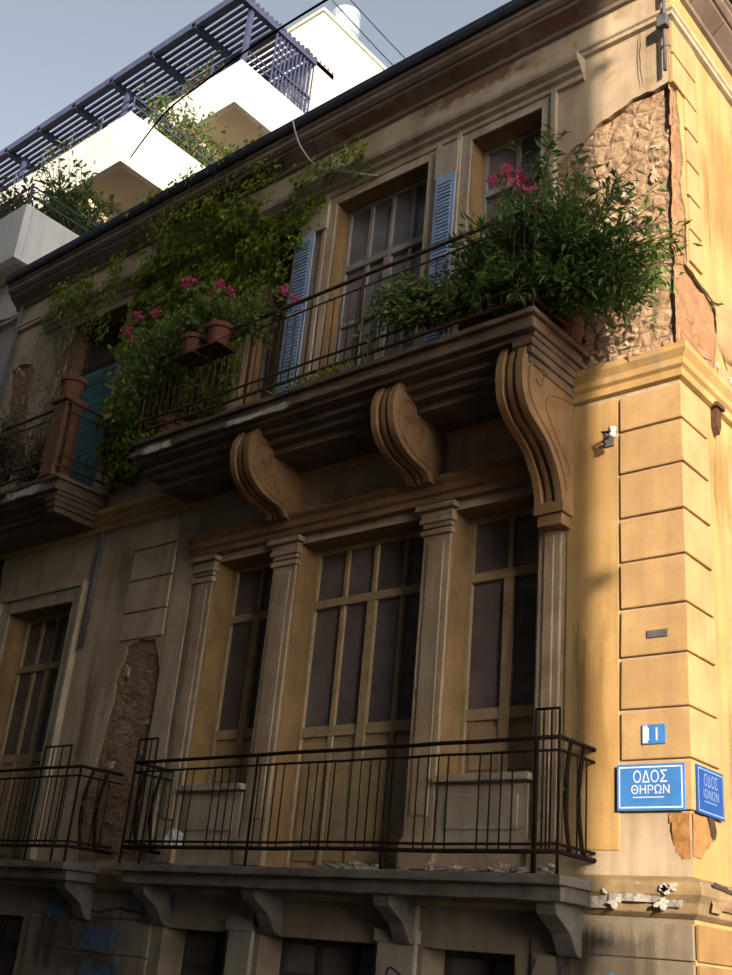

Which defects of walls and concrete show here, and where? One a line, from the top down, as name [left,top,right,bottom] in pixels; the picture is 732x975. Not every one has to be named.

peeling [558,82,732,387]
peeling [78,639,160,862]
spalling [669,812,717,859]
spalling [577,882,683,911]
spalling [712,882,732,915]